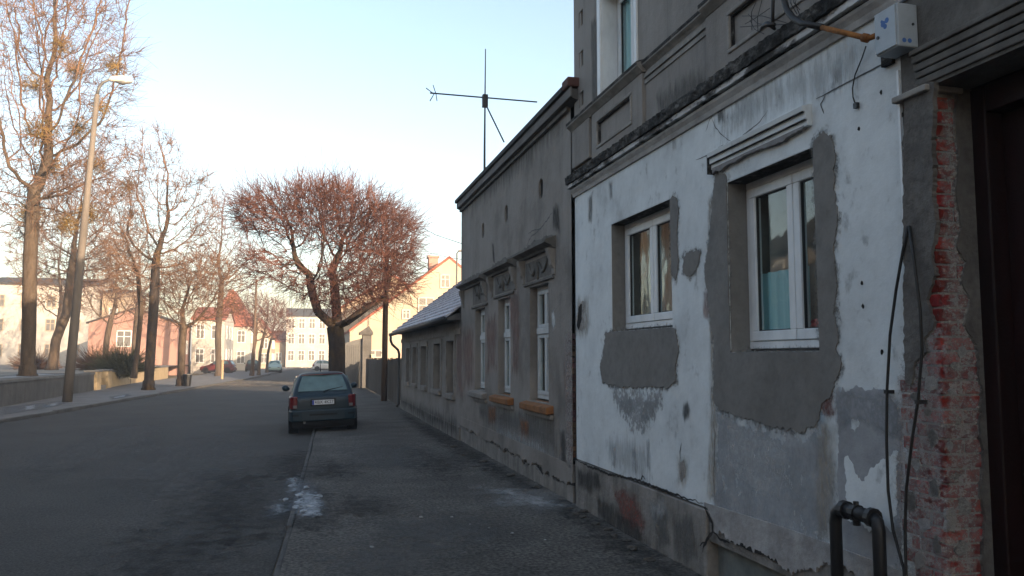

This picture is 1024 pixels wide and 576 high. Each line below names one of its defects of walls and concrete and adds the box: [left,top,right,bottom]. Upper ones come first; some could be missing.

leakage [405,400,697,568]
crack [575,423,778,564]
flaking render [823,385,903,570]